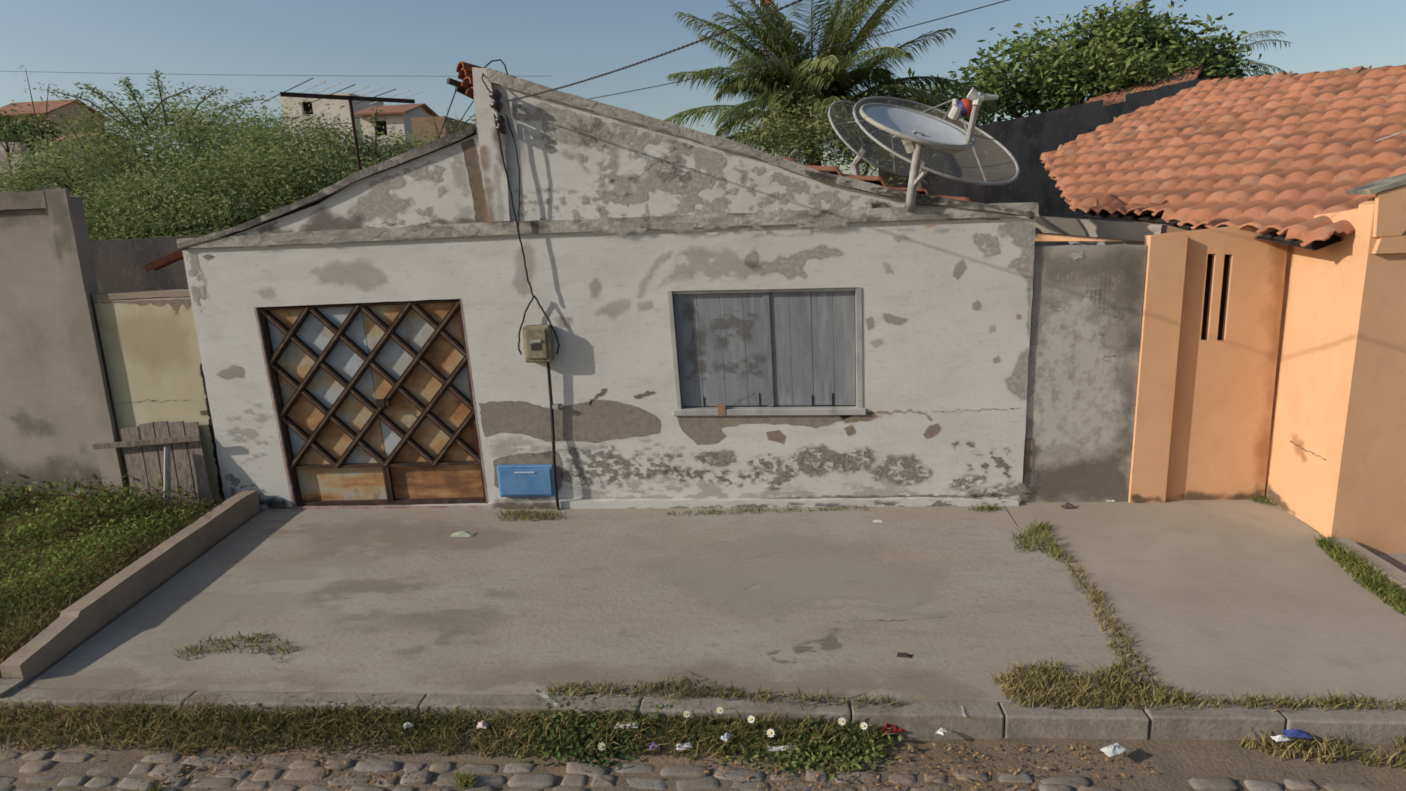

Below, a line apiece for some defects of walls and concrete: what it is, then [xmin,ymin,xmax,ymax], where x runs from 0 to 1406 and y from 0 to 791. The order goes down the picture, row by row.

peeling [508,102,890,234]
peeling [745,245,842,278]
peeling [866,314,907,330]
peeling [217,365,243,379]
flaking render [479,389,660,500]
flaking render [677,404,877,445]
flaking render [924,424,940,439]
peeling [227,474,286,509]